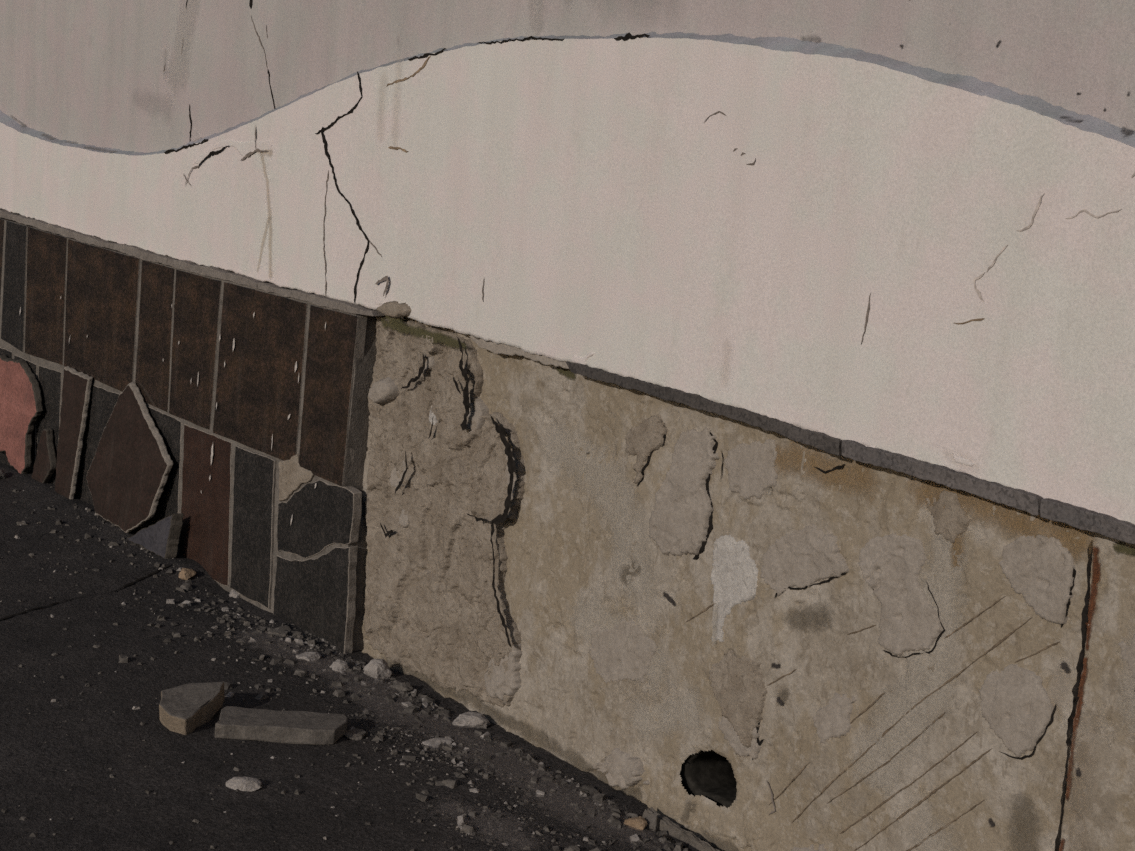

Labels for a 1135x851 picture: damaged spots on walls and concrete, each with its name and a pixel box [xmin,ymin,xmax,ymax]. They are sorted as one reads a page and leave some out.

crack [249,0,275,109]
crack [164,105,208,154]
flaking render [571,351,596,365]
spalling [363,275,525,707]
crack [774,572,847,598]
crack [883,580,945,658]
crack [999,541,1092,851]
corrosion [1066,548,1100,800]
spalling [680,750,737,808]
crack [752,723,775,815]
crack [646,827,691,851]